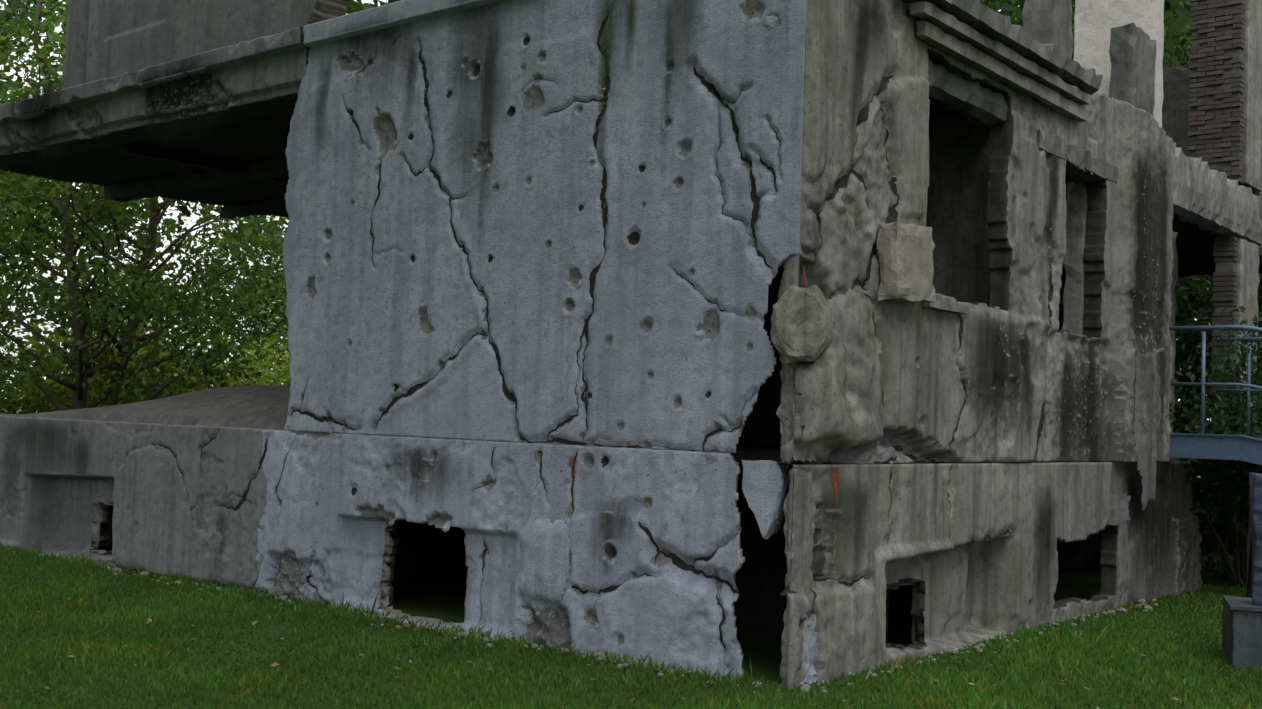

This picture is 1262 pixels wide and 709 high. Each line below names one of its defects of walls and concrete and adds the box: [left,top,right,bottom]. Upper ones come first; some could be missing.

crack [693,67,781,275]
crack [290,16,764,518]
crack [806,69,1013,557]
damp [977,324,1031,407]
damp [1057,346,1112,462]
damp [1130,164,1167,372]
crack [122,431,304,522]
crack [783,460,832,469]
spalling [265,550,305,600]
spalling [522,603,599,649]
crack [572,522,742,673]
crack [780,573,870,611]